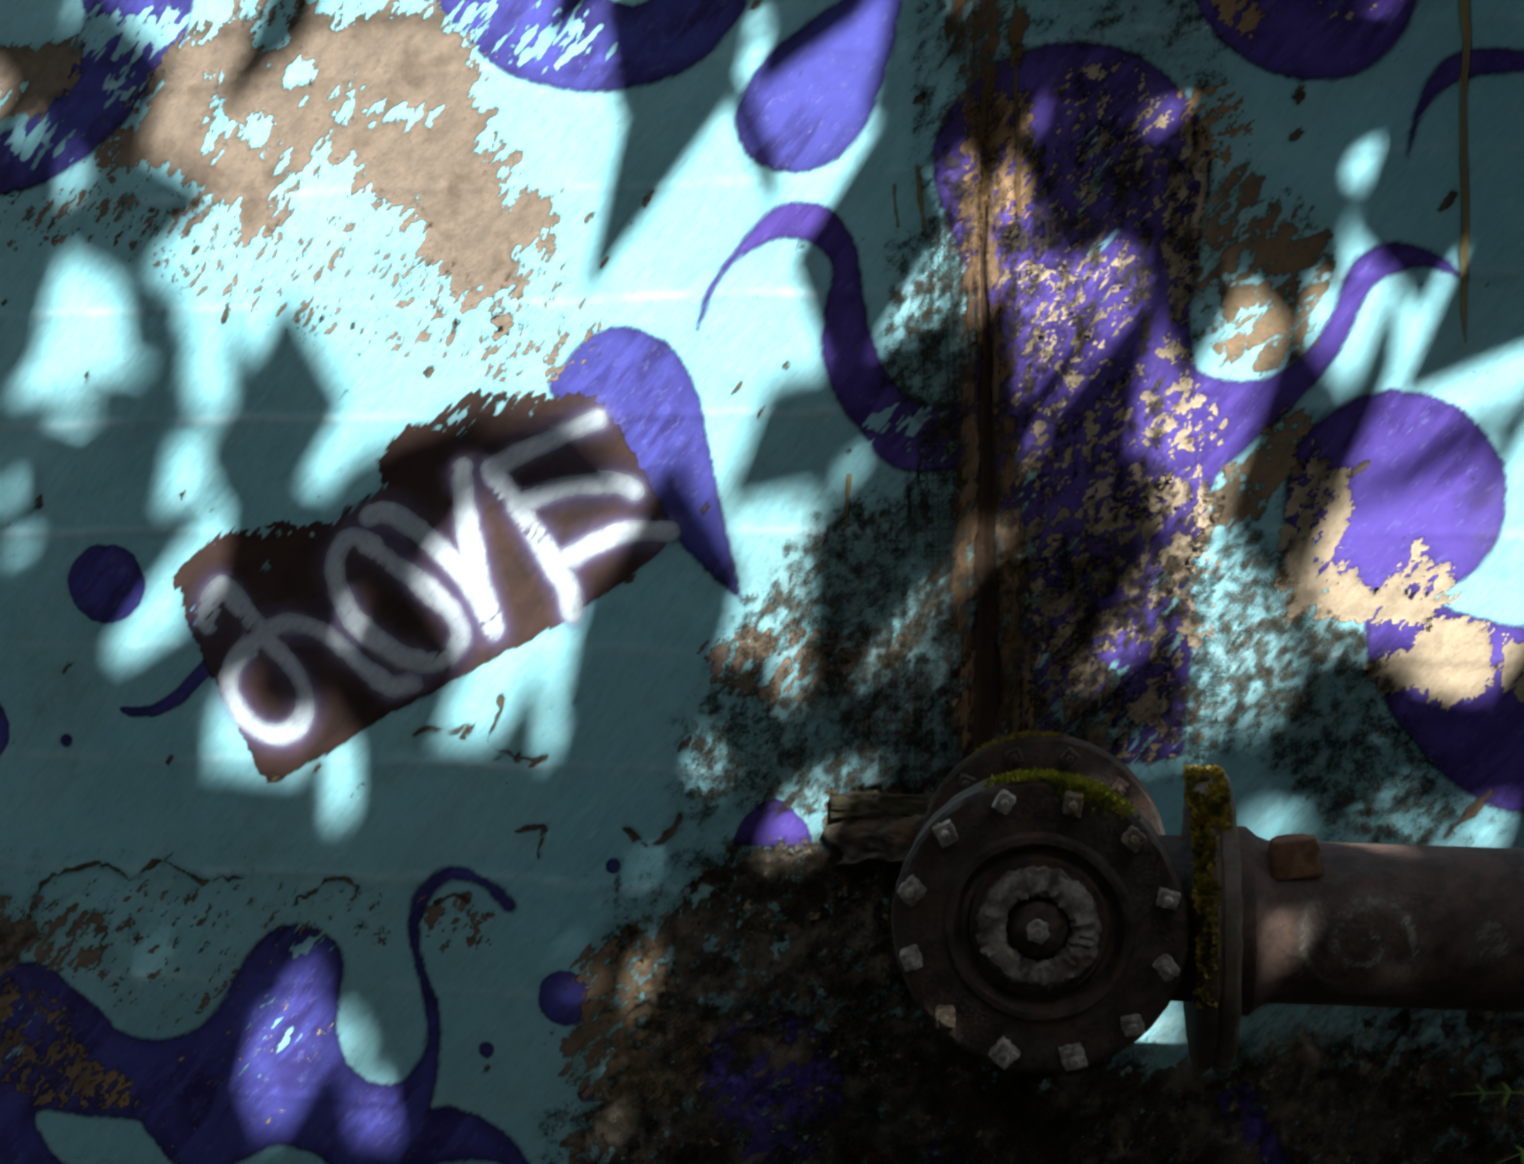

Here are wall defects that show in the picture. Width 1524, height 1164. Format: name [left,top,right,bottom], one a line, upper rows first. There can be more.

peeling [0,0,606,399]
rust [940,0,1030,761]
peeling [958,58,1524,766]
peeling [0,874,390,1111]
peeling [417,891,495,953]
leakage [539,837,1524,1164]